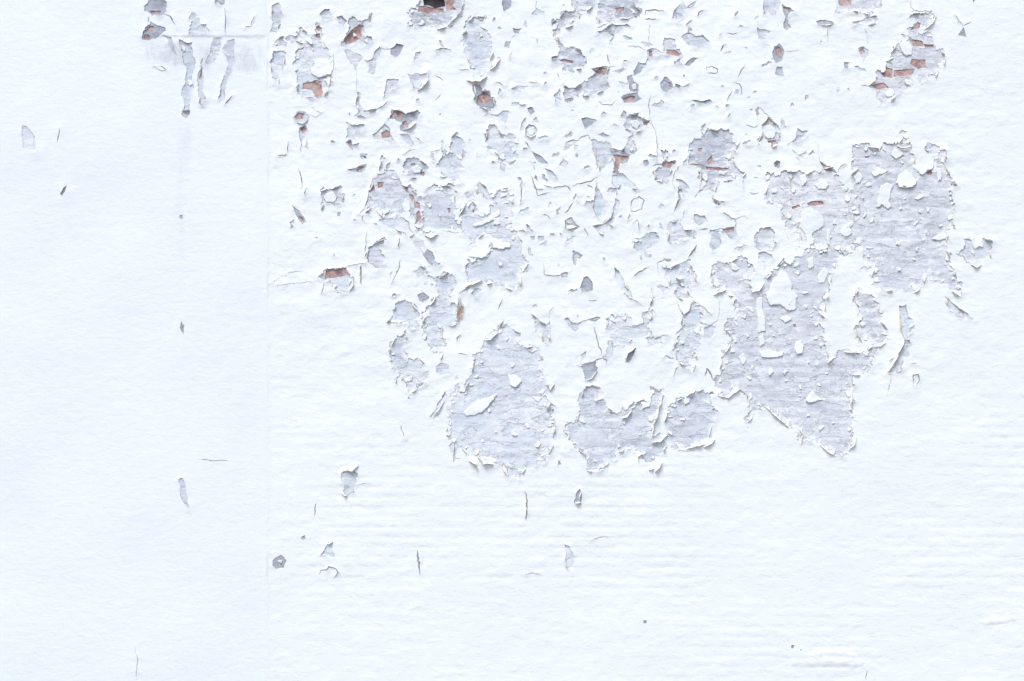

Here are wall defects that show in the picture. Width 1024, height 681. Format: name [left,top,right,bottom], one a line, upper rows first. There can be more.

peeling [142,0,236,118]
peeling [270,0,993,480]
peeling [341,465,371,497]